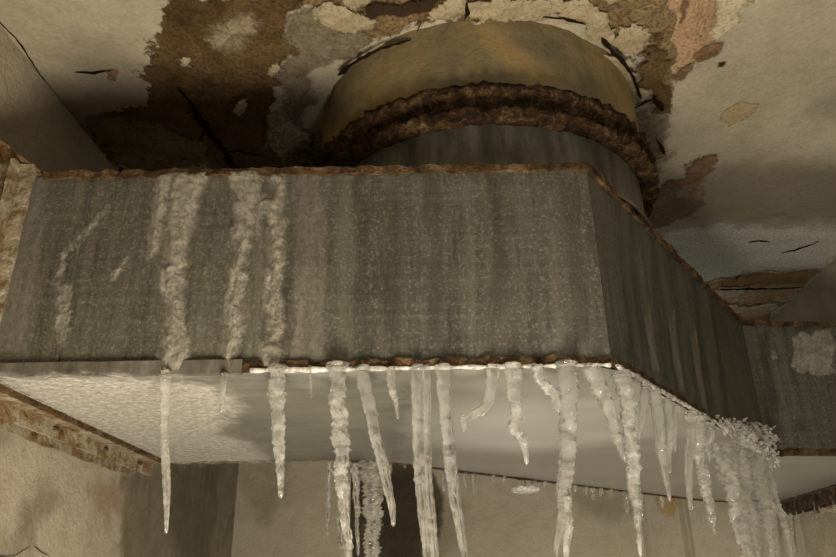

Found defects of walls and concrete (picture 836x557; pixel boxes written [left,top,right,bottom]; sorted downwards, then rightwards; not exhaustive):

crack [176,86,262,169]
spalling [82,0,759,228]
spalling [705,269,821,321]
rust [0,381,173,467]
leakage [121,462,239,557]